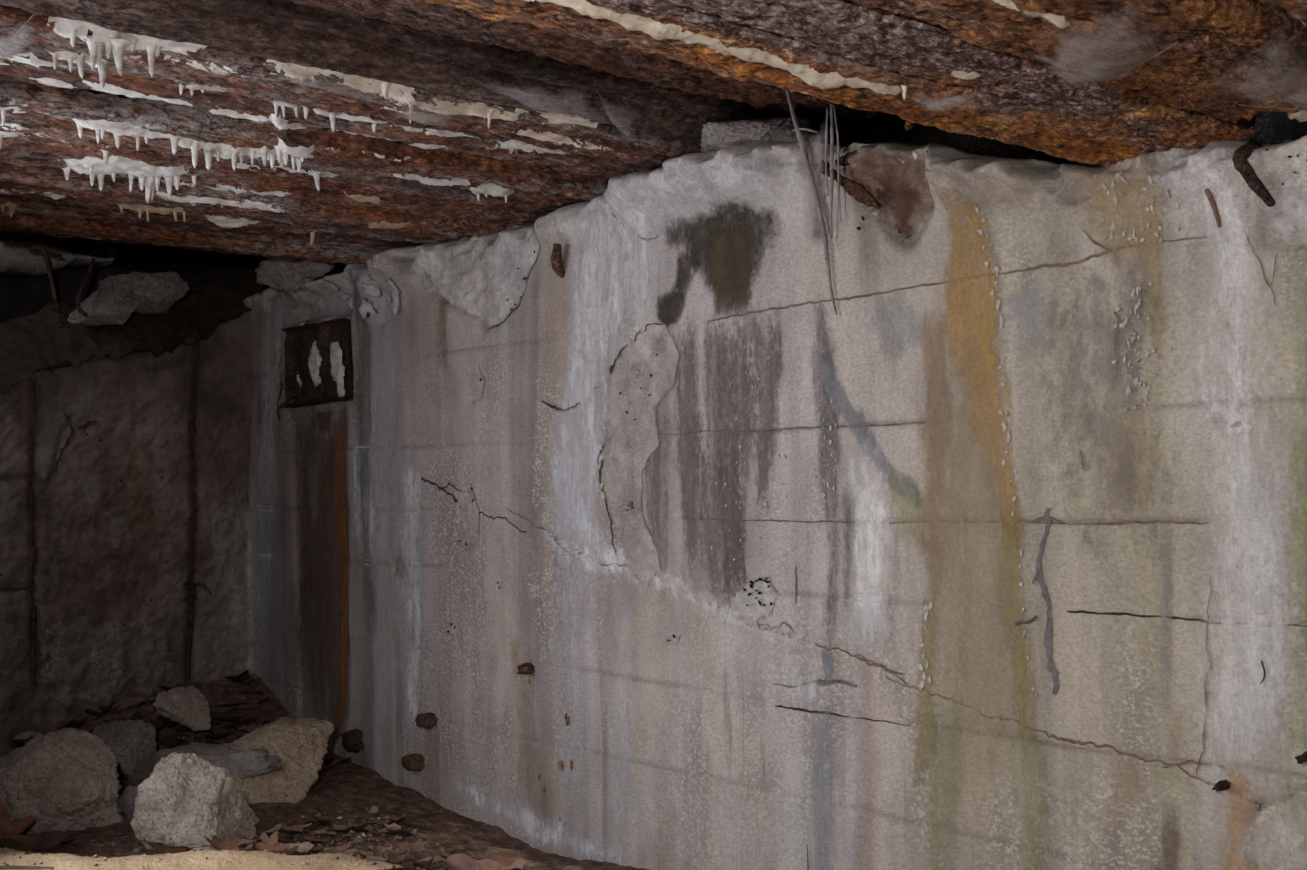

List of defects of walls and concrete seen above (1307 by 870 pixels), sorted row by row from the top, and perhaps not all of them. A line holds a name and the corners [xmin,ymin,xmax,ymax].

leakage [0,16,613,229]
corrosion [295,409,349,729]
spalling [388,222,540,331]
crack [541,321,669,412]
spalling [598,324,699,591]
leakage [550,149,833,704]
crack [658,422,925,435]
crack [414,429,1306,856]
leakage [814,305,923,640]
spalling [839,146,934,245]
crack [708,230,1278,322]
leakage [1173,144,1284,774]